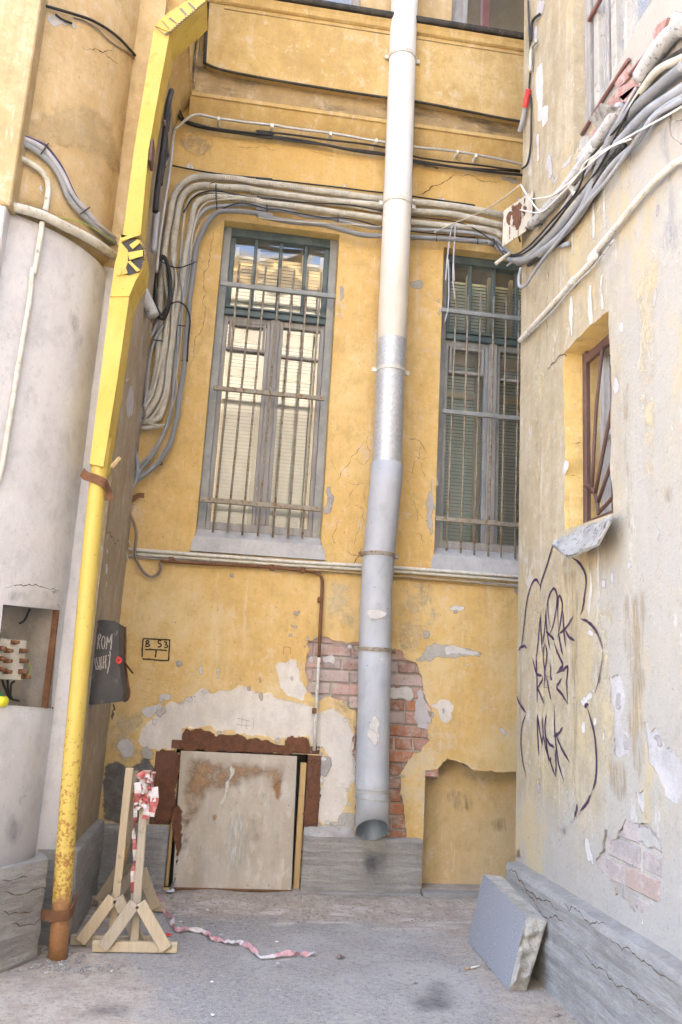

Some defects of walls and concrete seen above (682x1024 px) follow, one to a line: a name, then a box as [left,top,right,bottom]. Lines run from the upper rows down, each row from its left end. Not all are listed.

crack [331,437,370,563]
peeling [367,603,387,619]
flaking render [117,631,481,837]
flaking render [581,675,629,757]
flaking render [645,722,682,804]
crack [4,876,46,927]
crack [509,870,671,1014]